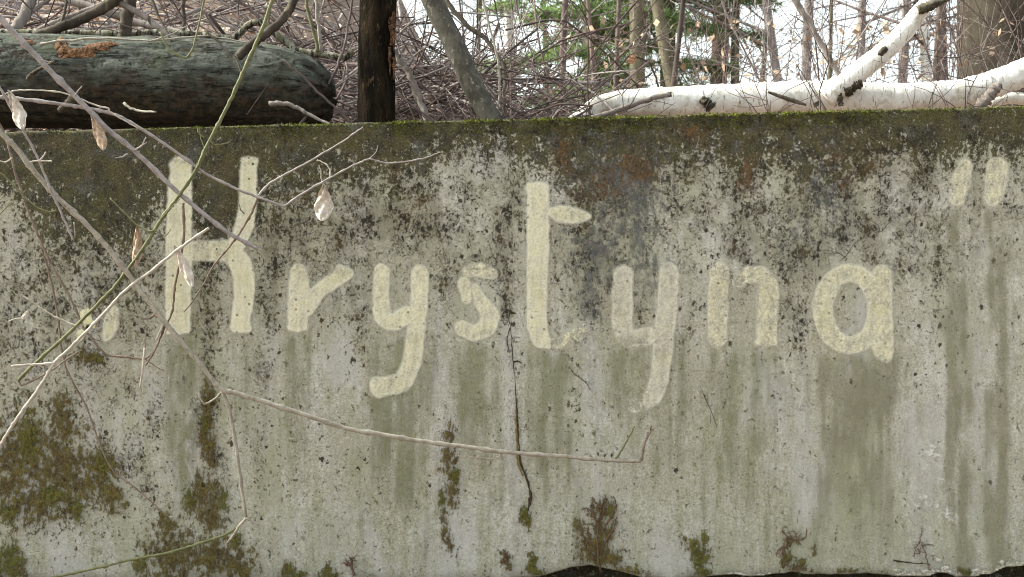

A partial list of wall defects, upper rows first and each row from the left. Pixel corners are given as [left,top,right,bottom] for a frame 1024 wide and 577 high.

leakage [372,387,414,498]
leakage [390,341,405,382]
crack [505,302,532,511]
leakage [553,145,675,320]
leakage [905,286,1008,570]
leakage [987,264,1007,369]